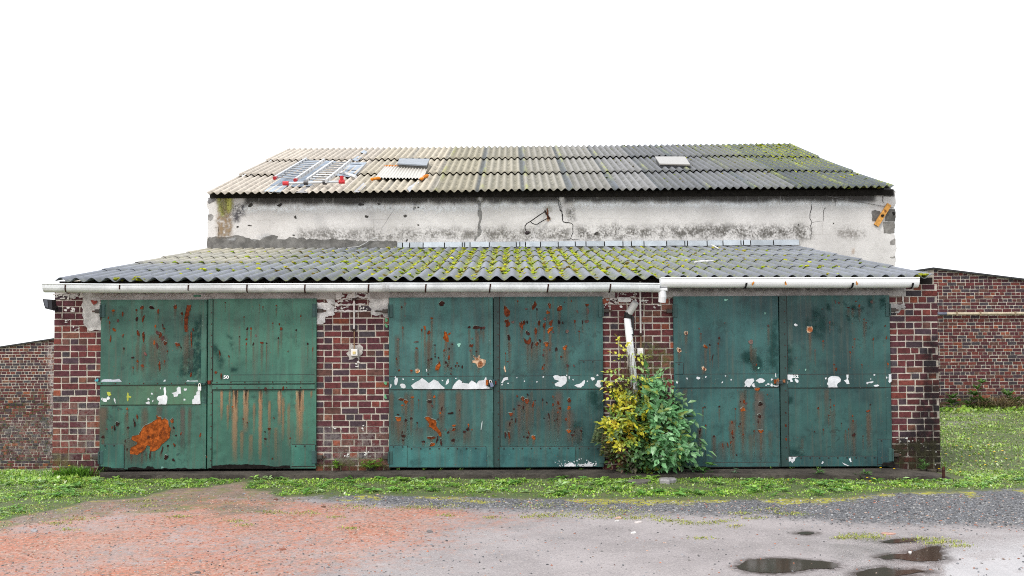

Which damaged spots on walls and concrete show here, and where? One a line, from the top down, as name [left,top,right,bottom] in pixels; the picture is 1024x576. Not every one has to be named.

leakage [217,198,555,240]
crack [474,201,482,241]
leakage [302,226,806,240]
spalling [317,292,389,324]
corrosion [396,317,486,375]
corrosion [504,300,589,372]
peeling [146,380,200,404]
peeling [390,369,509,389]
peeling [524,374,601,388]
peeling [825,375,849,387]
corrosion [220,386,304,440]
corrosion [97,408,290,471]